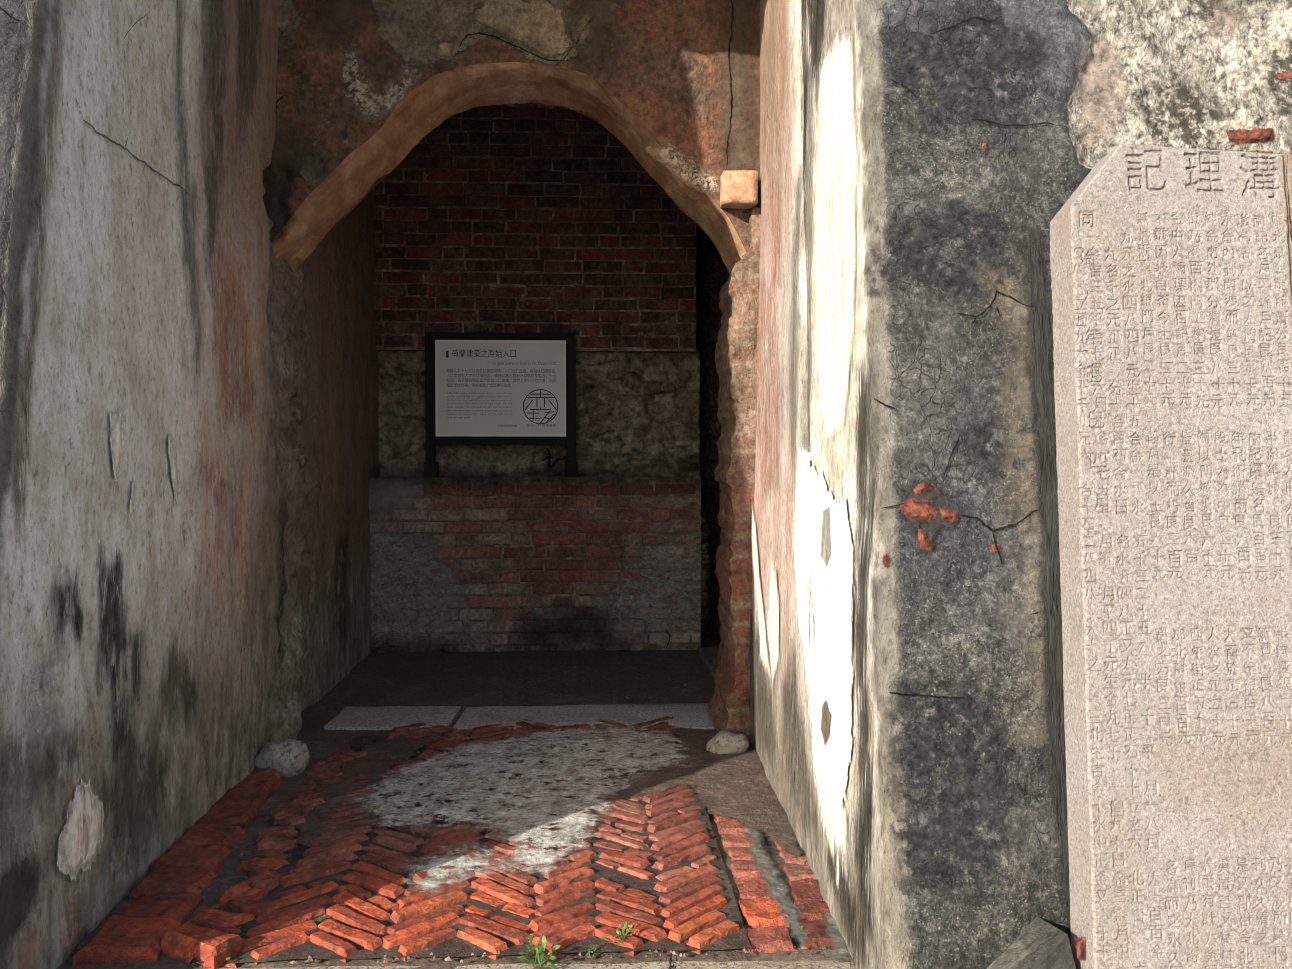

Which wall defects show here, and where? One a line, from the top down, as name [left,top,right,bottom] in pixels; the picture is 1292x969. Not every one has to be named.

peeling [371,0,592,68]
spalling [1066,0,1292,169]
crack [83,120,190,195]
peeling [957,416,1010,469]
spalling [899,480,962,555]
leakage [54,582,83,640]
peeling [792,447,855,830]
leakage [97,553,167,884]
leakage [162,649,197,725]
leakage [0,662,80,969]
peeling [57,778,104,881]